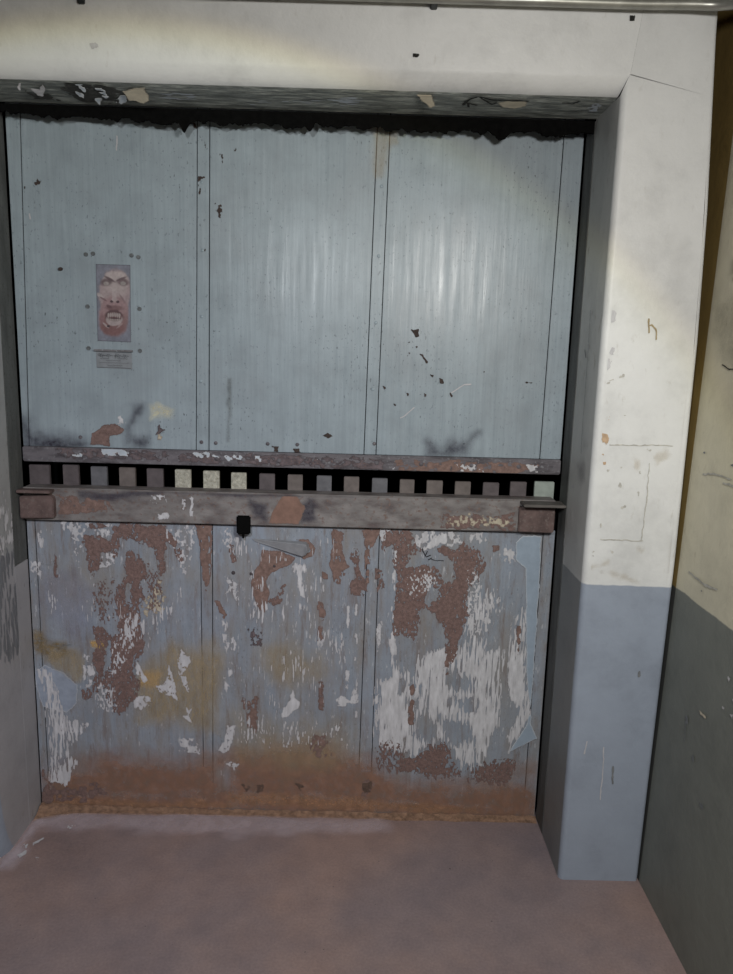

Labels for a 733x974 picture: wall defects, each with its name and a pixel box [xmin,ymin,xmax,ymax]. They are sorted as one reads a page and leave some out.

spalling [17,83,200,105]
rust [55,424,539,473]
rust [58,492,184,716]
peeling [150,495,196,575]
rust [239,494,314,525]
rust [251,539,315,613]
rust [322,512,516,675]
peeling [414,512,510,551]
peeling [35,579,192,787]
peeling [218,528,359,770]
peeling [373,535,542,771]
rust [41,734,535,816]